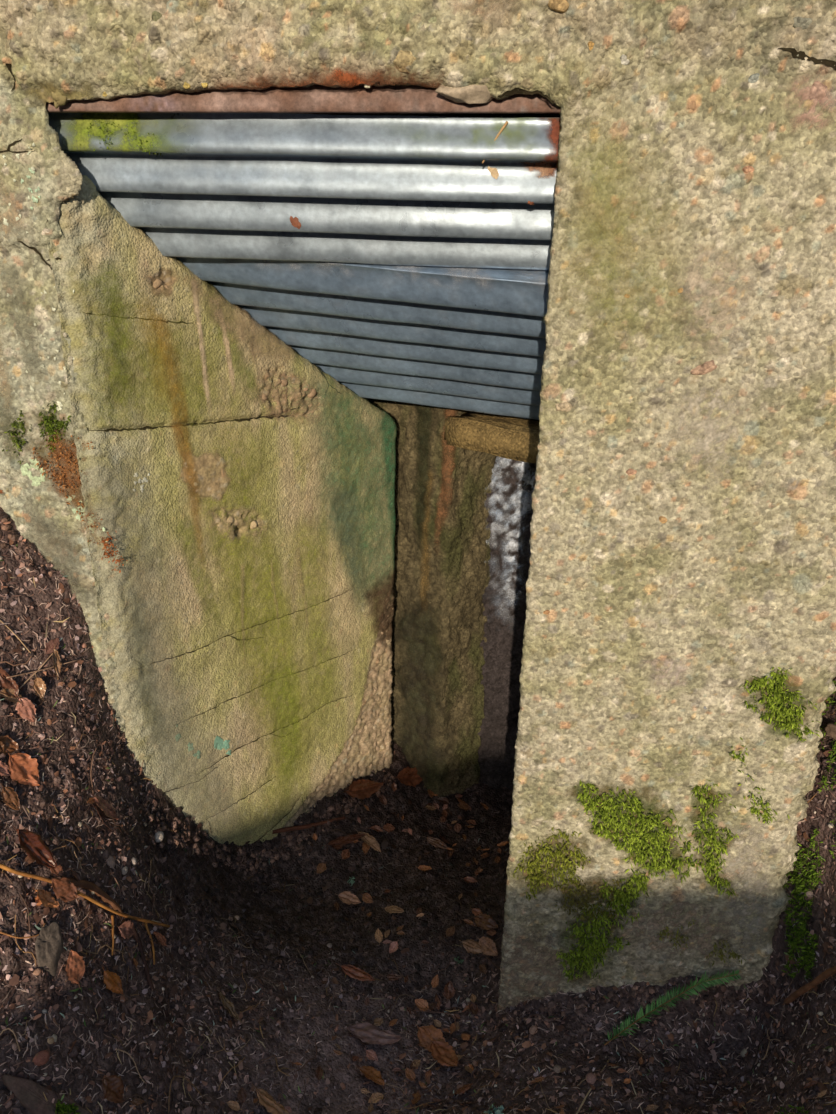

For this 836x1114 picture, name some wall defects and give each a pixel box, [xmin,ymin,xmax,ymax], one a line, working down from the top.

rust [218,69,439,90]
crack [778,48,836,70]
crack [0,139,38,153]
rust [522,118,561,177]
crack [88,363,341,443]
damp [319,385,450,775]